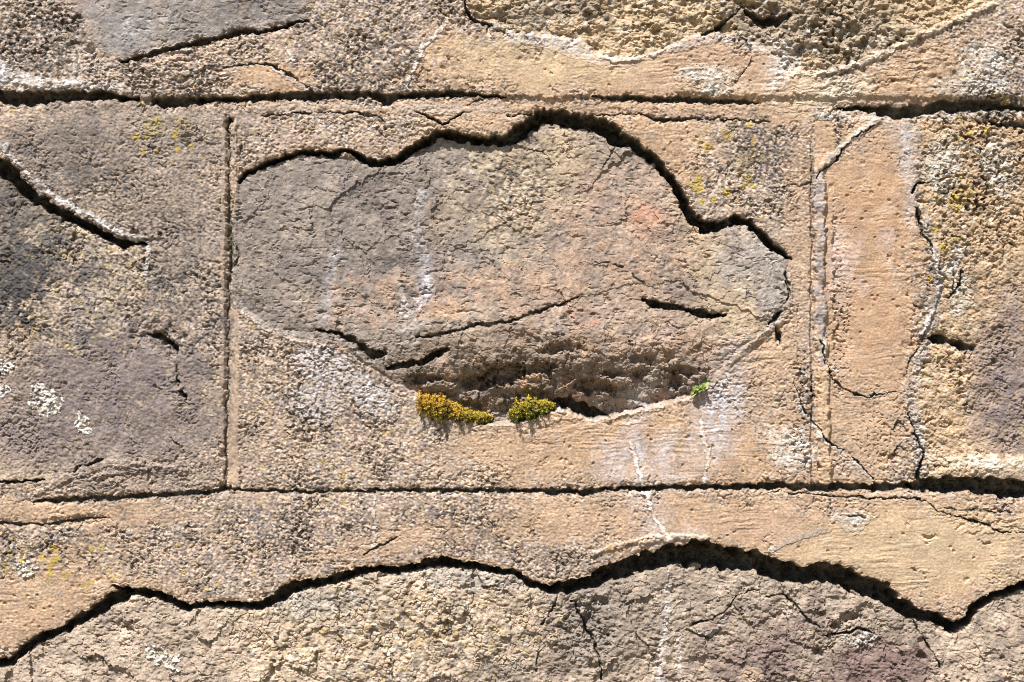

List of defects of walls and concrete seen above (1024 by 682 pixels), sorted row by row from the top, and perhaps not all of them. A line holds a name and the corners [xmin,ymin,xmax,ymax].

crack [74,19,310,73]
crack [464,0,516,40]
crack [0,141,152,283]
crack [316,296,580,371]
spalling [232,124,786,424]
crack [237,94,792,345]
crack [770,181,1024,534]
crack [0,536,1024,679]